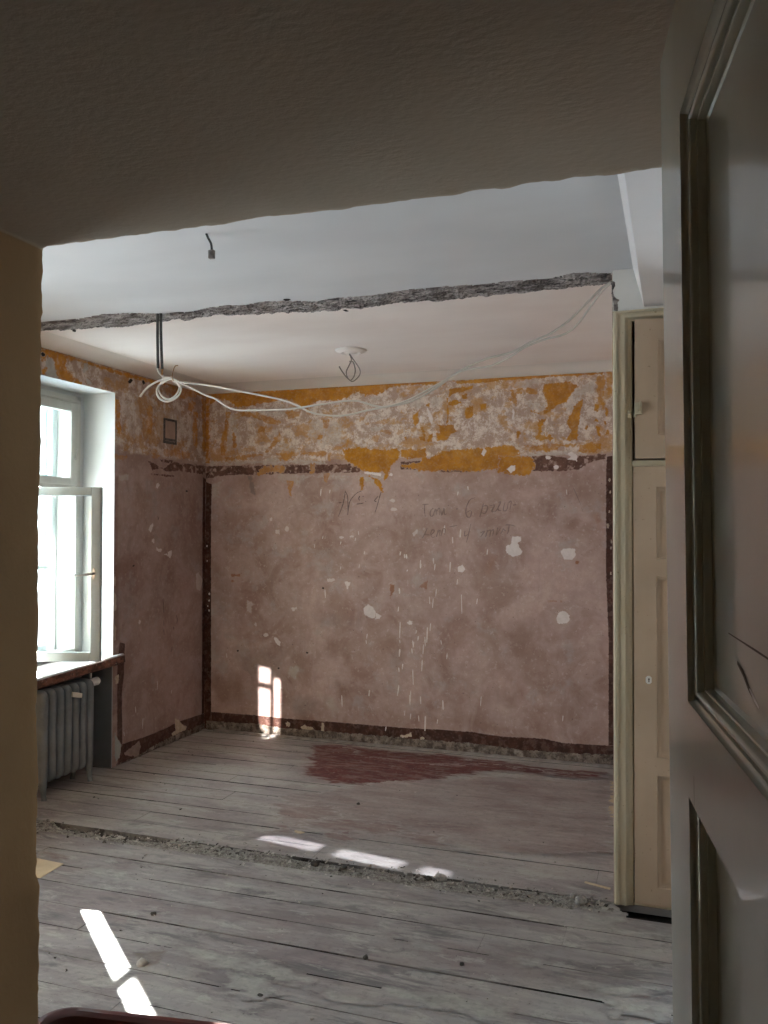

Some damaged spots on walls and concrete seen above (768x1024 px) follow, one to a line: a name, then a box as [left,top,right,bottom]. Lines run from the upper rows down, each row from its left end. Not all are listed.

spalling [41,272,619,332]
peeling [41,348,612,497]